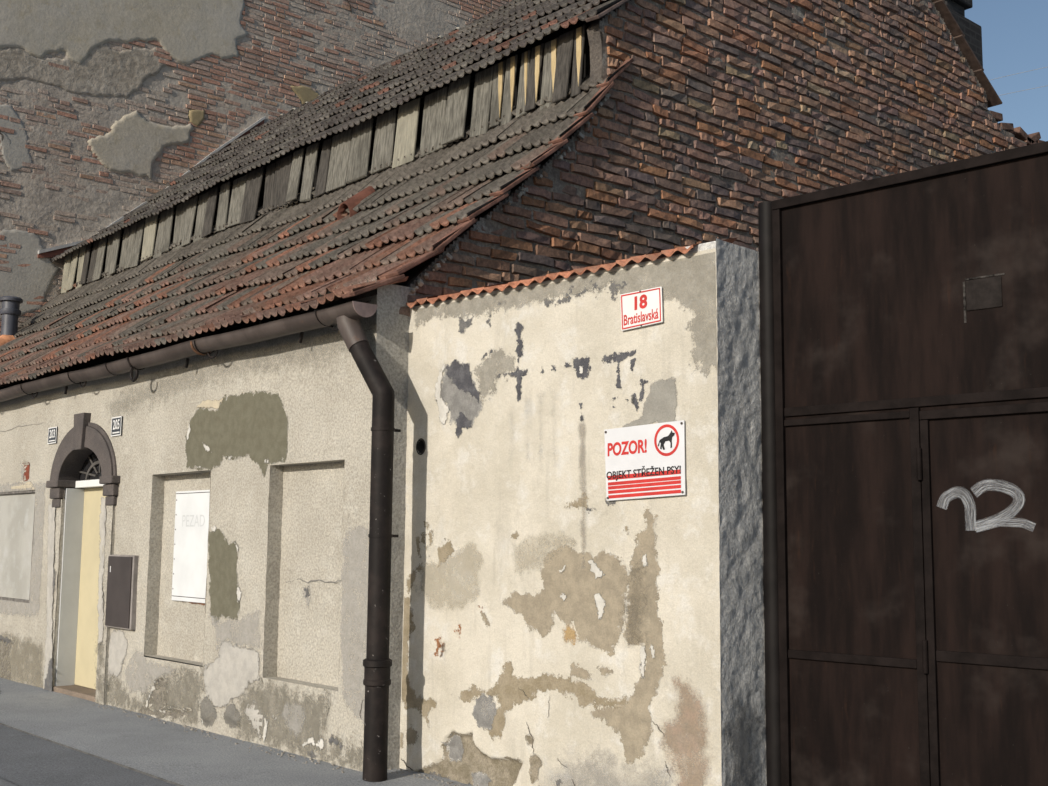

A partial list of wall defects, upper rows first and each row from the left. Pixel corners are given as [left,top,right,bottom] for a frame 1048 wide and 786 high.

peeling [0,0,249,98]
peeling [0,104,32,171]
peeling [87,110,205,179]
peeling [0,229,59,319]
flaking render [414,252,717,377]
peeling [435,322,528,438]
peeling [541,350,677,427]
flaking render [185,390,289,478]
flaking render [208,526,242,622]
crack [286,577,341,585]
peeling [400,509,667,786]
peeling [244,700,267,740]